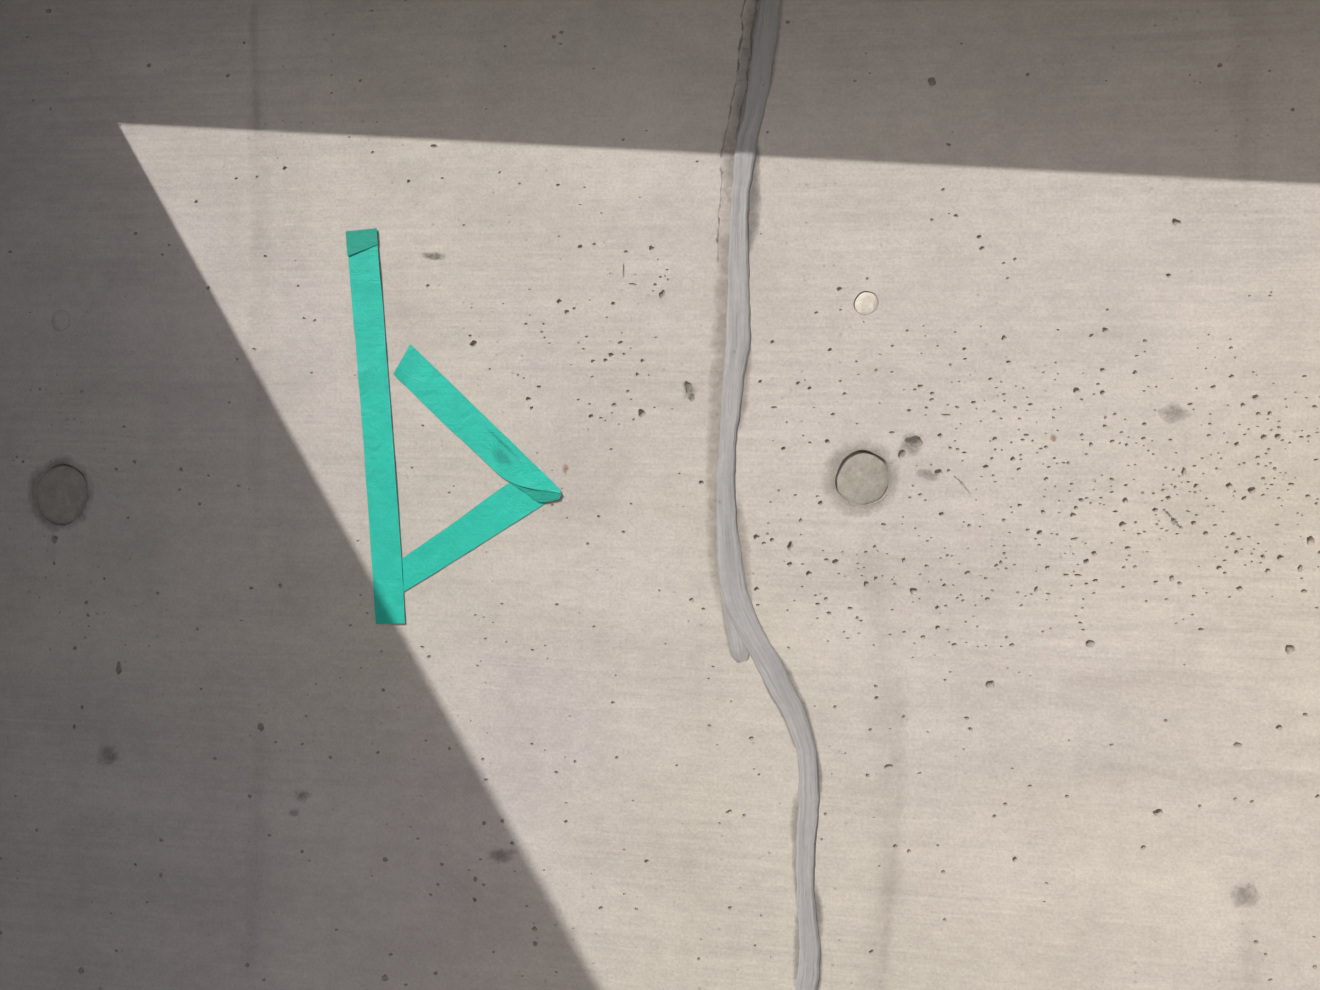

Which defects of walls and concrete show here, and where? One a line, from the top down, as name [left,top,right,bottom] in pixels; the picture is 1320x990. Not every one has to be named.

crack [716,0,821,990]